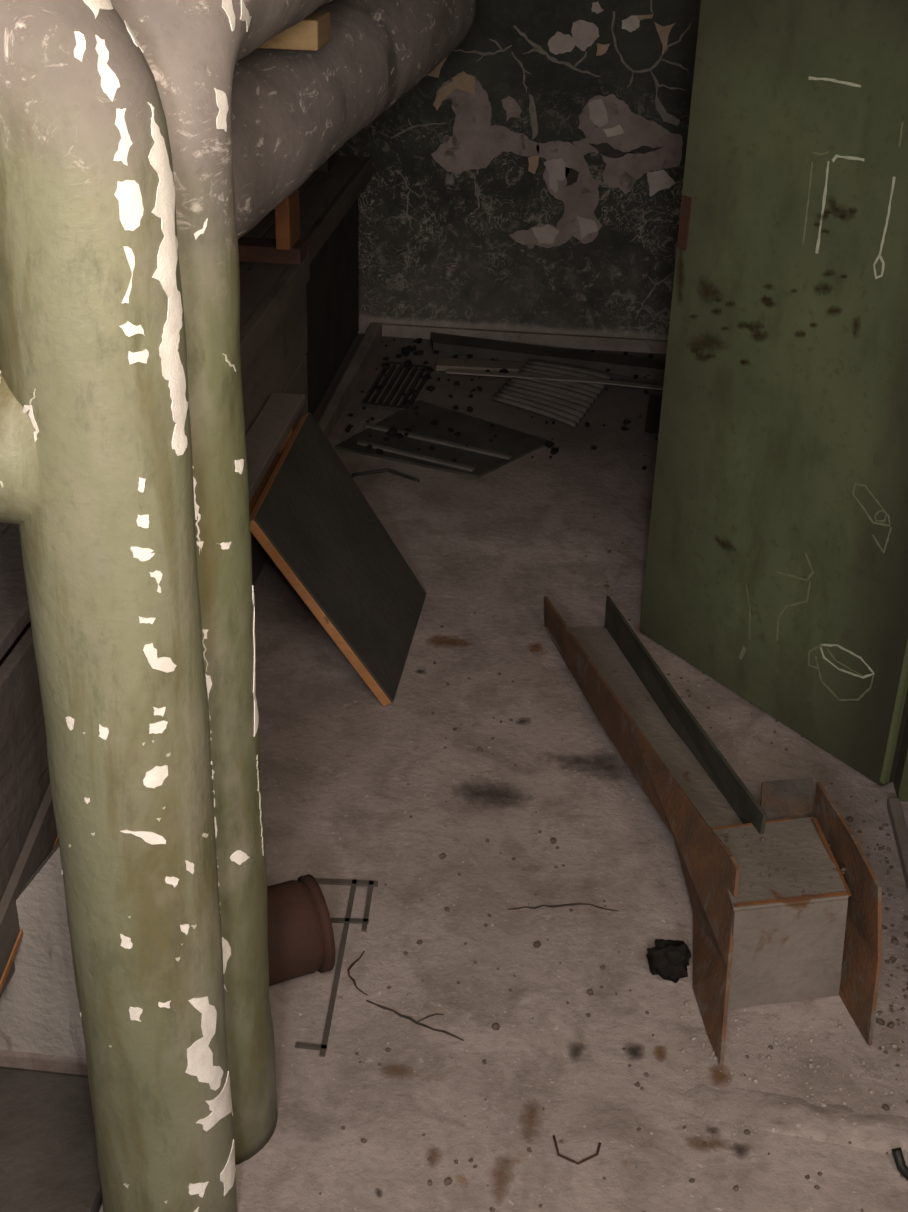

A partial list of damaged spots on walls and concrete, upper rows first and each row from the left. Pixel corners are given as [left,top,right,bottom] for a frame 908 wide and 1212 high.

crack [453,11,692,93]
peeling [548,1,609,56]
peeling [622,15,675,55]
peeling [427,56,683,248]